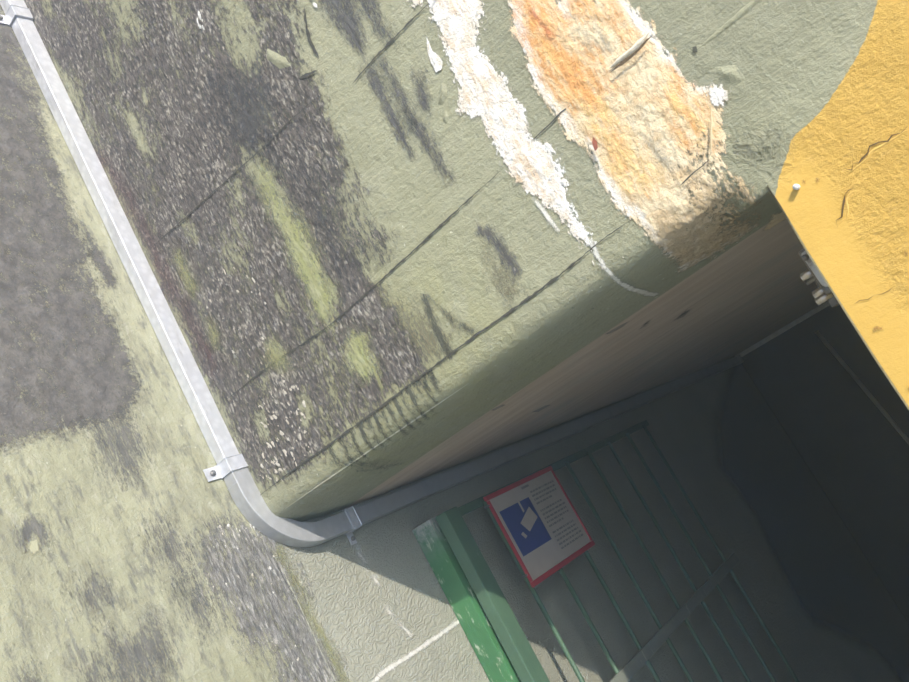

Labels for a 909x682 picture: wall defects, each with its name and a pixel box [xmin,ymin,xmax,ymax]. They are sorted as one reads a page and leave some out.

damp [0,7,155,491]
damp [24,0,474,488]
damp [321,0,658,300]
rust [507,0,787,273]
crack [836,128,909,227]